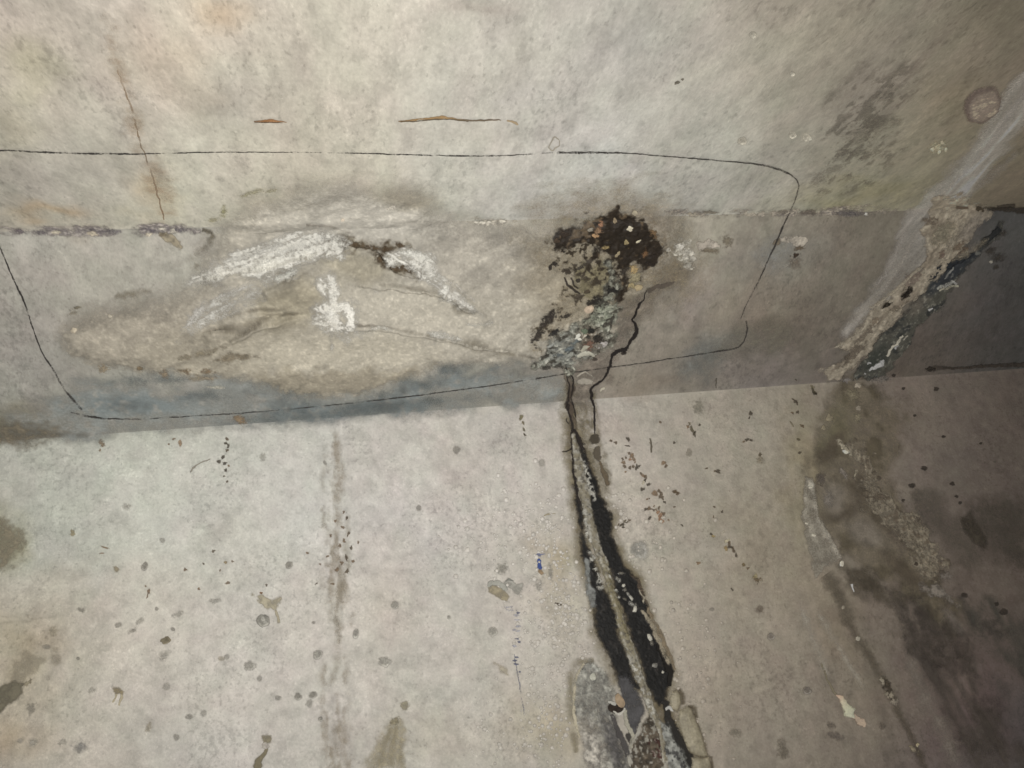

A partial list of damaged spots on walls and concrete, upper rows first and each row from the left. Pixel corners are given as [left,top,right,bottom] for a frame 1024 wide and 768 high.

crack [117,70,165,220]
corrosion [398,116,518,125]
leakage [0,230,697,444]
spalling [531,260,623,378]
peeling [864,335,908,374]
crack [544,282,697,768]
leakage [808,376,1024,768]